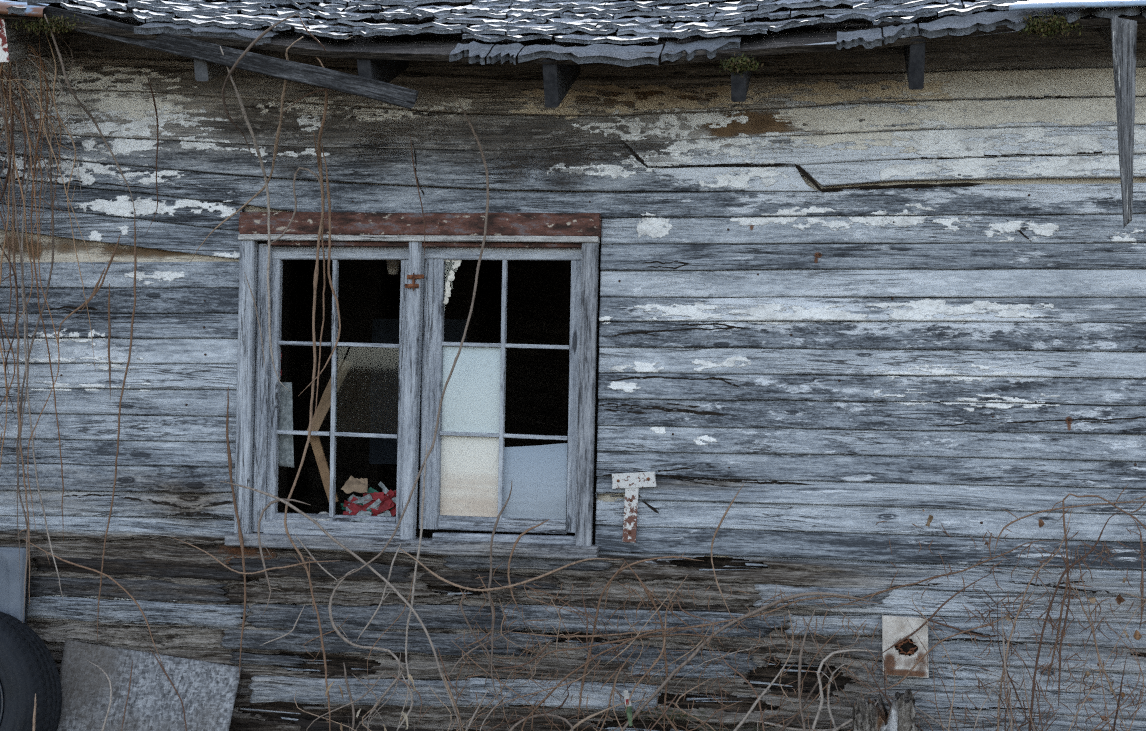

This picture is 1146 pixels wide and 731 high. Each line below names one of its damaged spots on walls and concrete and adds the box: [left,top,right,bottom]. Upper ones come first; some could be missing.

peeling [256,97,473,132]
peeling [0,61,330,235]
crack [622,140,1102,192]
damp [3,236,88,257]
peeling [88,230,104,241]
damp [104,245,187,257]
peeling [212,251,239,259]
peeling [636,212,673,238]
peeling [1110,228,1146,245]
peeling [634,298,1054,325]
rust [885,638,926,677]